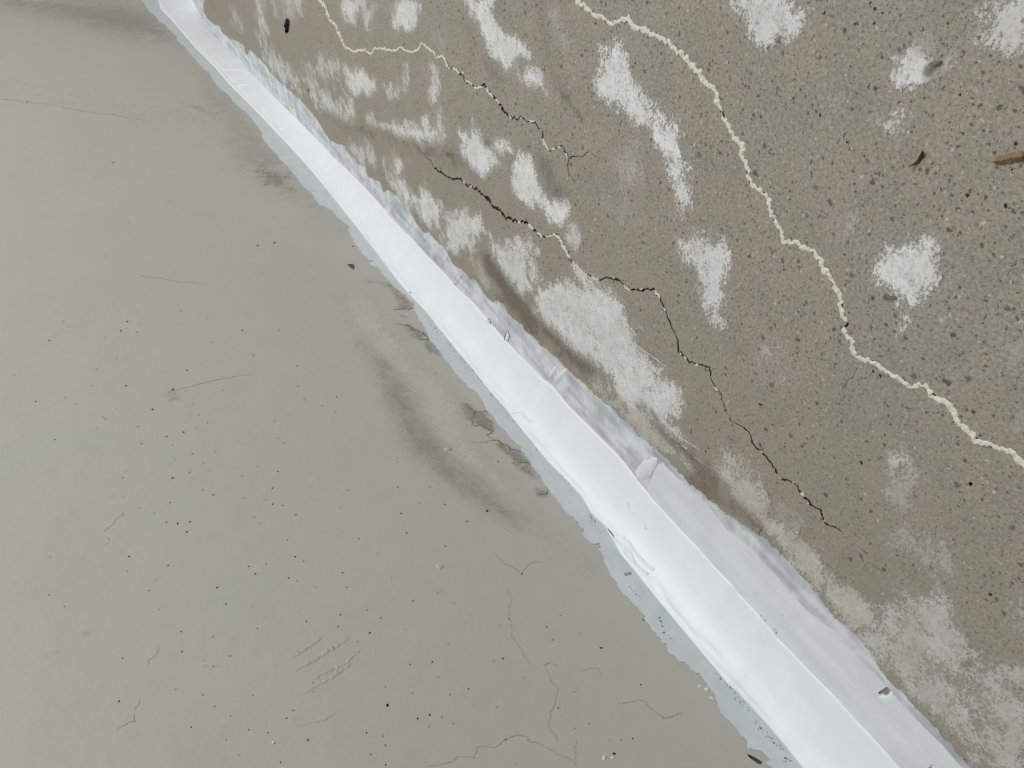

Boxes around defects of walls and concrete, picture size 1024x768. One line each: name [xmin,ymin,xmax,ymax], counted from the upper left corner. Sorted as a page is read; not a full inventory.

crack [318,0,588,182]
damp [255,0,700,492]
crack [426,157,842,532]
damp [592,34,732,332]
damp [730,0,810,52]
crack [575,0,1024,468]
damp [868,233,943,332]
damp [890,44,950,91]